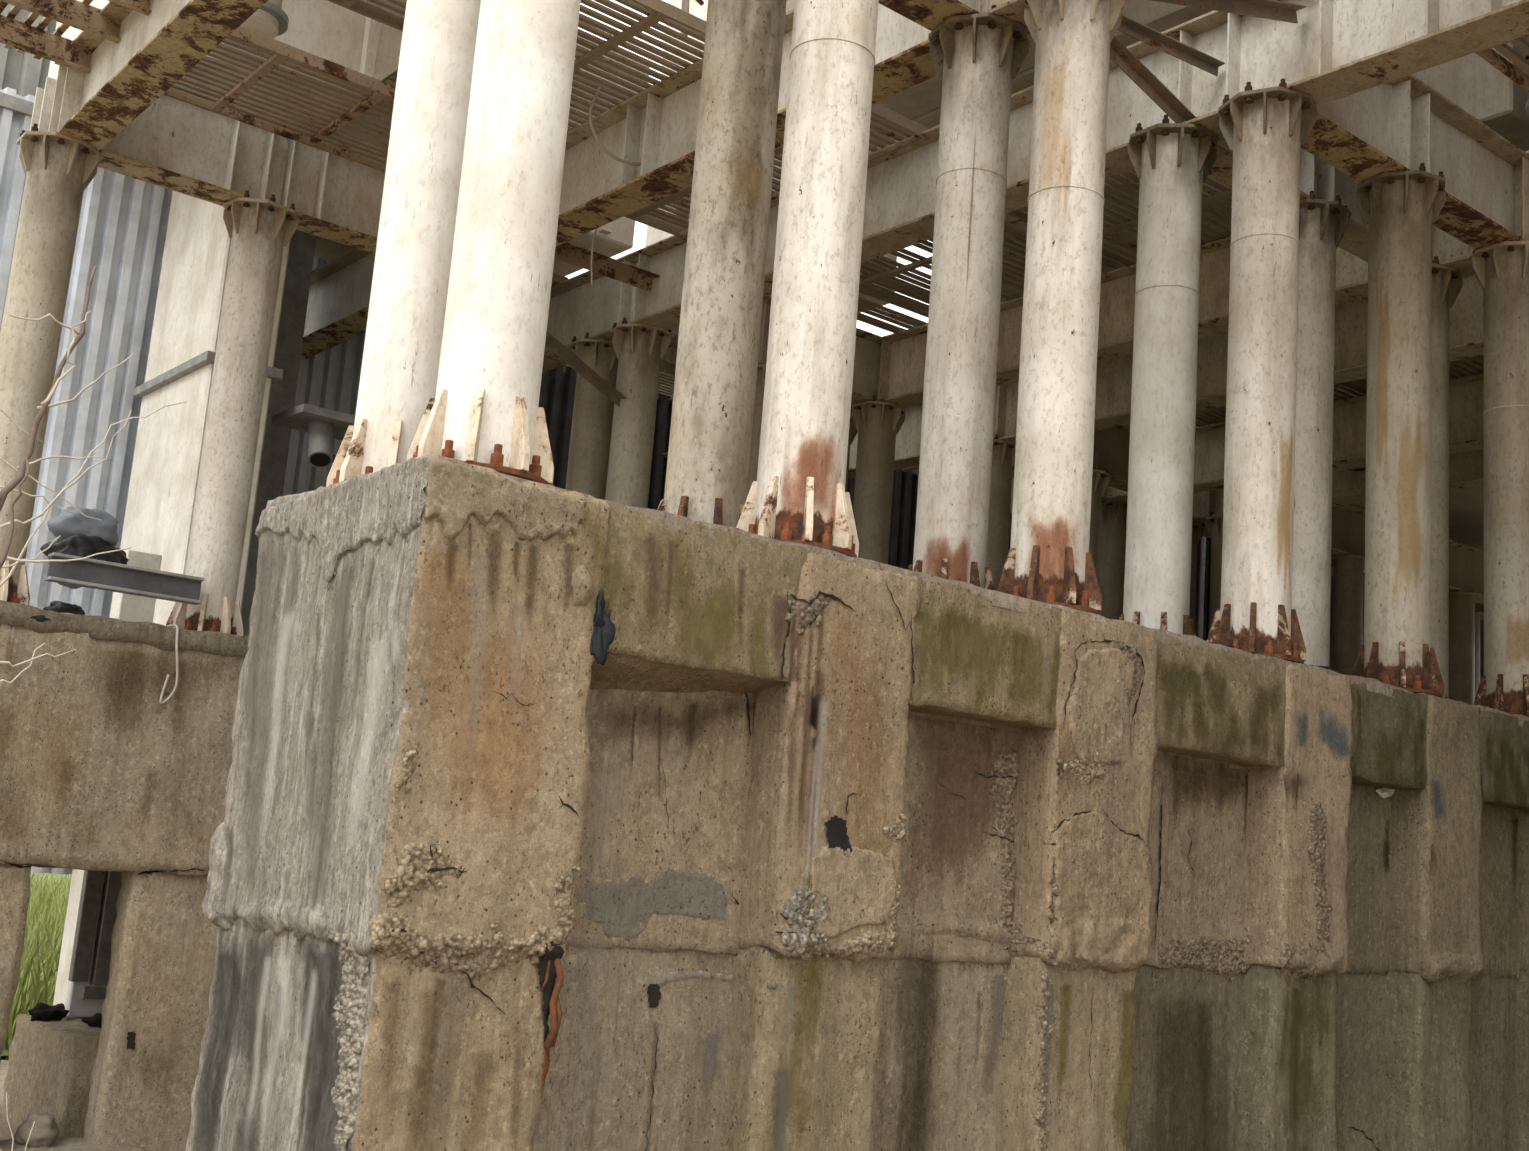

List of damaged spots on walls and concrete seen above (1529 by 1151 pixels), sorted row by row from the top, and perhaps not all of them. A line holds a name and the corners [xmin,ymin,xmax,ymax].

crack [744,692,752,737]
crack [781,591,856,680]
crack [881,575,915,698]
crack [1063,640,1145,749]
crack [941,766,1018,800]
peeling [771,814,907,962]
crack [1051,782,1194,945]
spalling [327,842,583,1151]